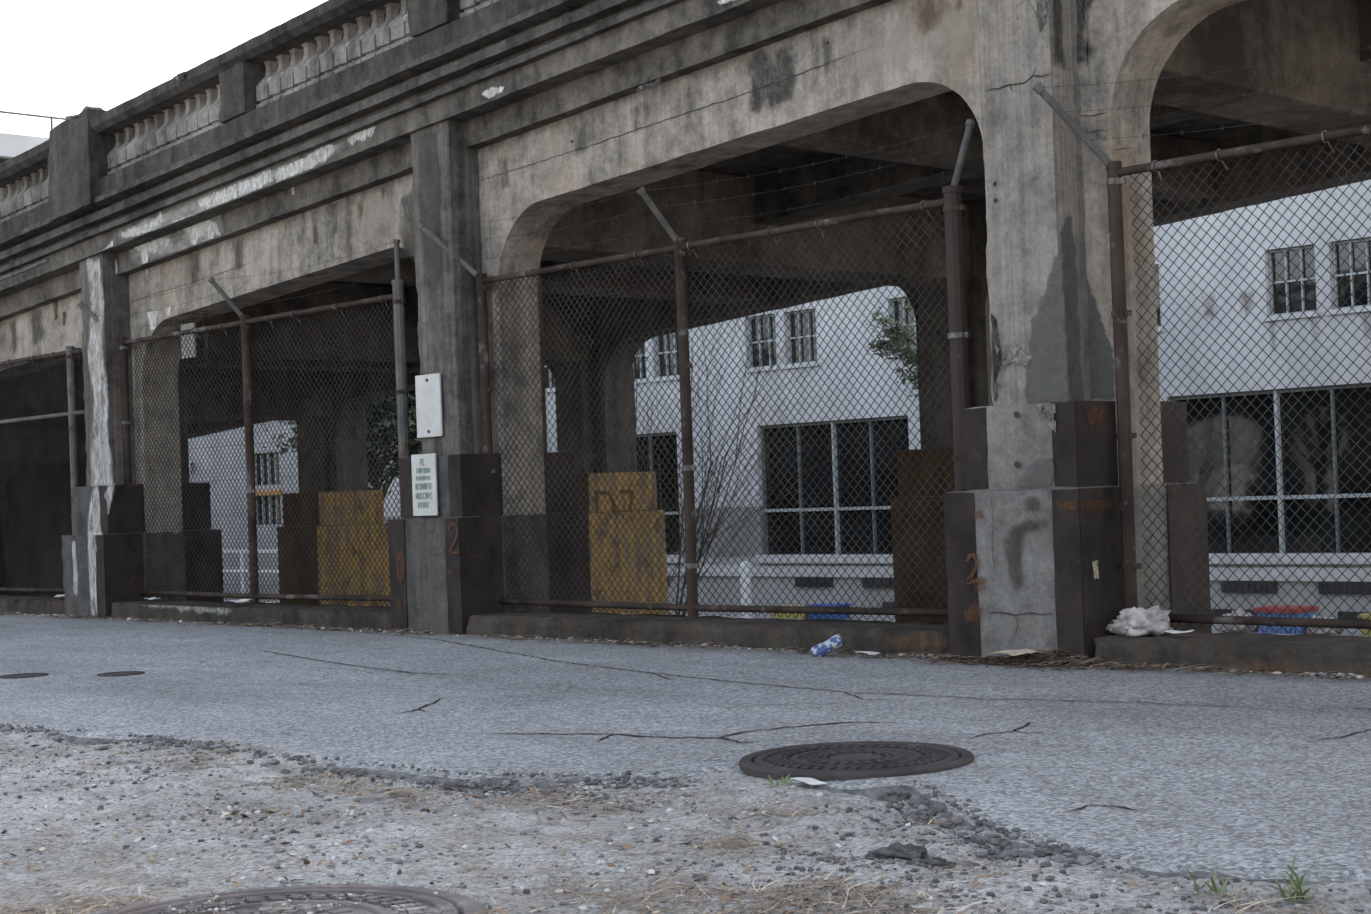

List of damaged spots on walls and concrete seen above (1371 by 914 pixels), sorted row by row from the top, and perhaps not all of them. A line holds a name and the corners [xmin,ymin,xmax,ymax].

water stain [749,49,793,110]
crack [986,68,1053,93]
water stain [72,126,375,615]
water stain [1024,216,1115,403]
water stain [1005,457,1054,588]
crack [263,535,1073,742]